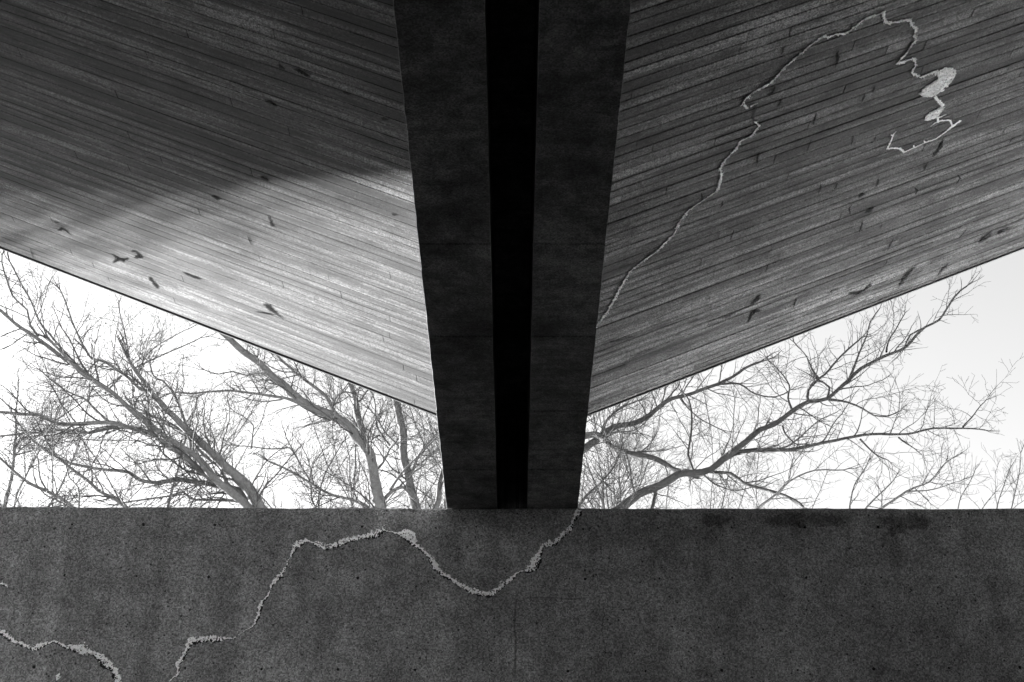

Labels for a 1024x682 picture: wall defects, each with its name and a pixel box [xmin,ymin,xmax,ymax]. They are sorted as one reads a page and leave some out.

crack [597,10,961,325]
crack [0,630,123,682]
crack [169,509,582,682]